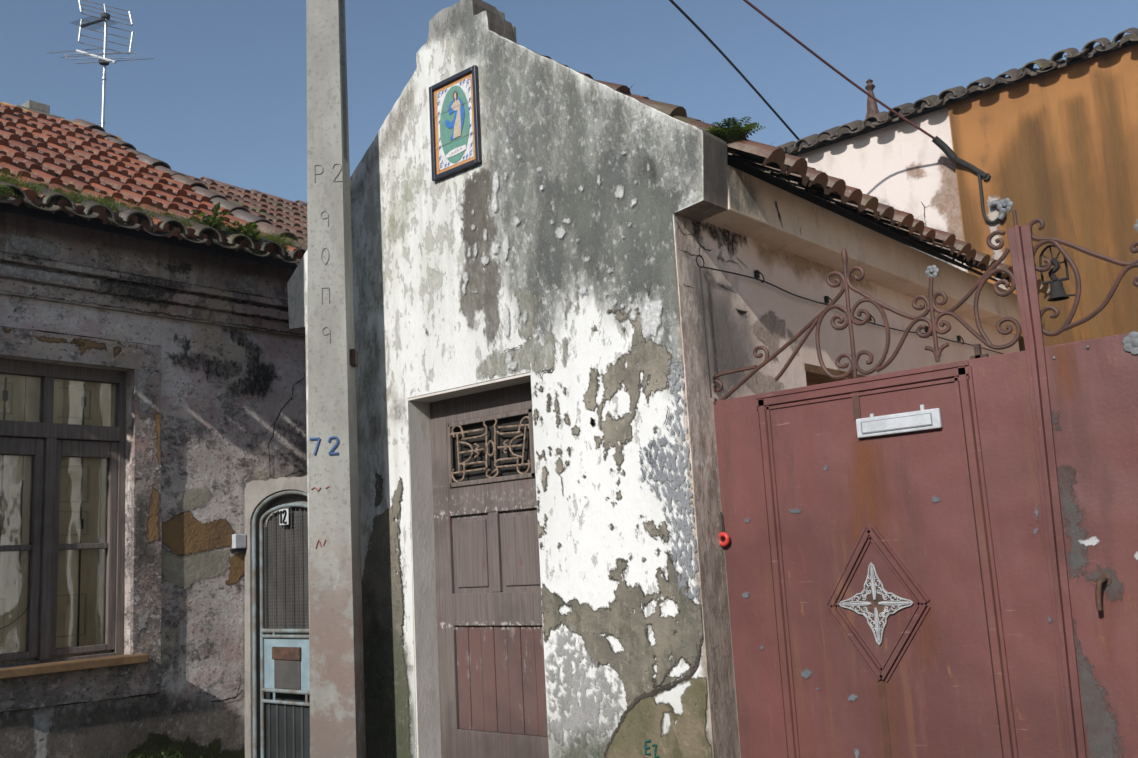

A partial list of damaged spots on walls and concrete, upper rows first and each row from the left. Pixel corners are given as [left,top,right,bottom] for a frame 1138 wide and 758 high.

peeling [491,170,507,212]
leakage [459,6,698,371]
peeling [614,180,638,206]
peeling [467,210,520,265]
peeling [550,218,579,243]
flaking render [30,335,122,358]
leakage [168,328,278,398]
crack [267,378,305,479]
flaking render [146,488,245,585]
peeling [476,284,712,758]
leakage [363,622,413,758]